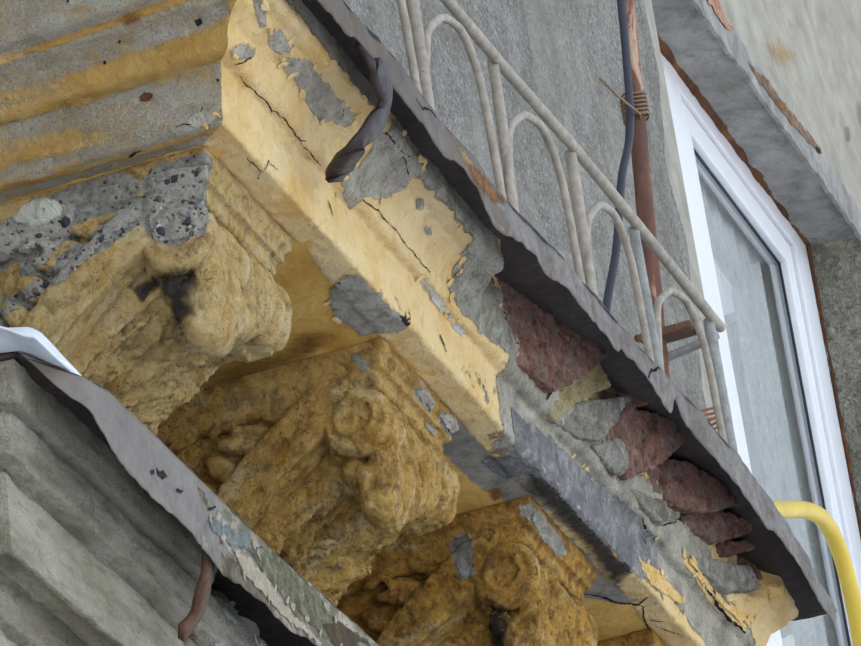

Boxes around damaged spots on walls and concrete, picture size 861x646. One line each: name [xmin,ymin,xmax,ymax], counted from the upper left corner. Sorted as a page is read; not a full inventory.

flaking render [231,43,256,60]
crack [236,57,321,166]
peeling [254,0,362,128]
peeling [341,125,427,210]
spalling [0,163,209,327]
crack [363,199,431,273]
leakage [130,271,197,329]
flaking render [322,276,412,337]
spalling [416,249,785,626]
peeling [208,514,371,646]